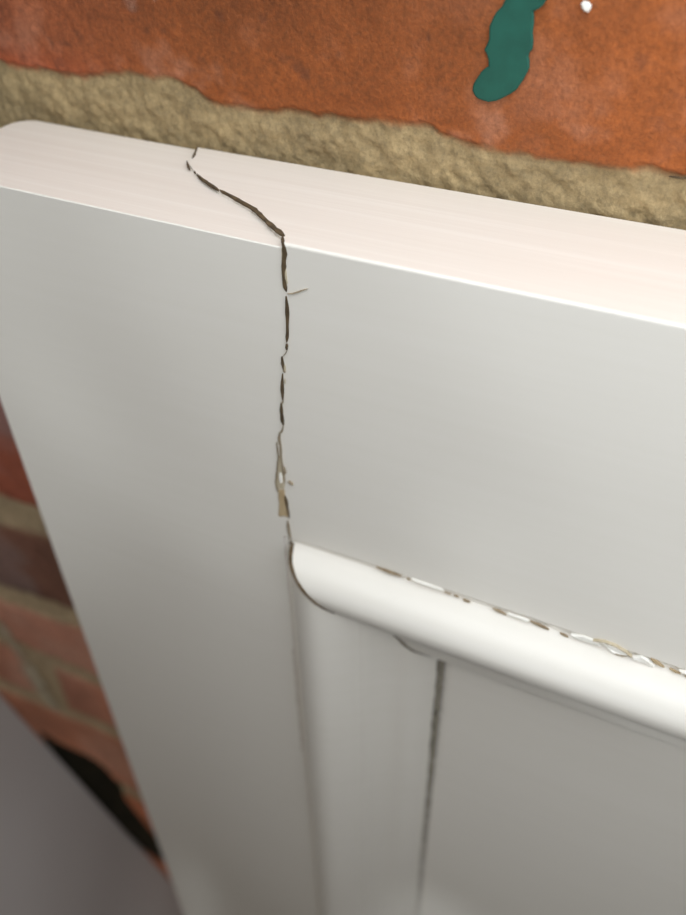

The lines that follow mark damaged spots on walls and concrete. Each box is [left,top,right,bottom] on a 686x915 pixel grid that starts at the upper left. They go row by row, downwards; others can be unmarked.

crack [186,146,335,614]
peeling [376,566,470,603]
peeling [493,607,549,630]
peeling [560,632,686,677]
spalling [41,732,164,861]